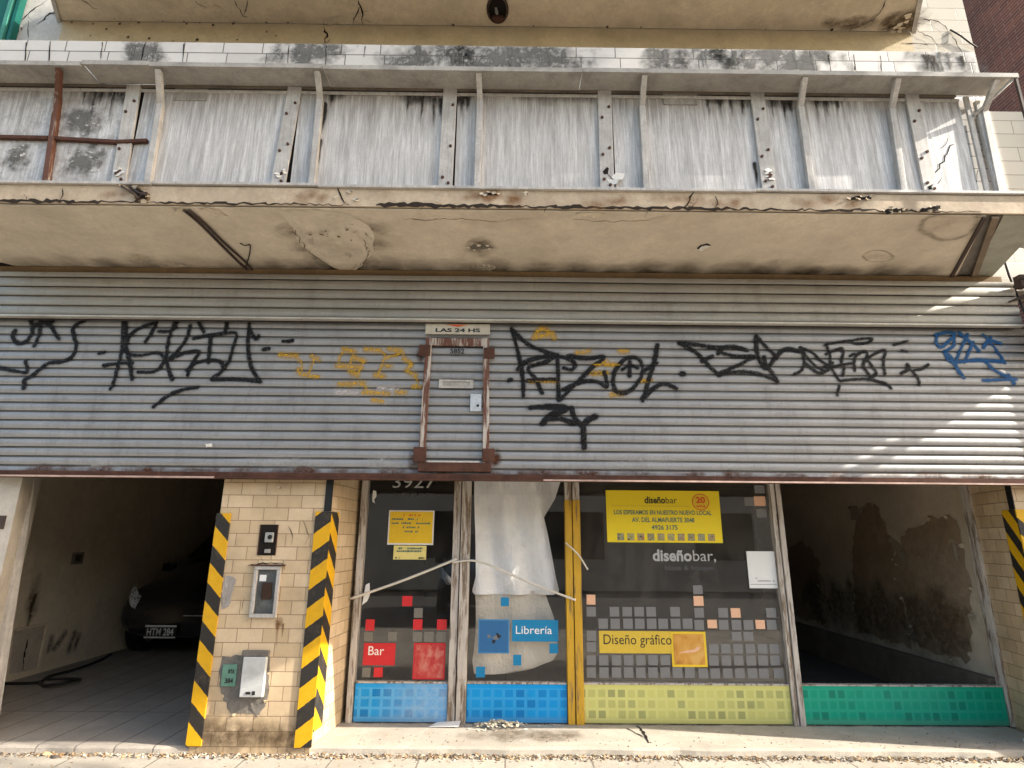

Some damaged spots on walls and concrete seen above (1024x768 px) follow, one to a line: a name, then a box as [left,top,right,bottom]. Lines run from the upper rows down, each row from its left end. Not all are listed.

water stain [882,12,924,31]
crack [844,1,962,52]
water stain [266,22,342,64]
water stain [382,45,591,68]
water stain [646,48,831,70]
water stain [920,52,971,72]
crack [935,138,982,184]
crack [0,188,349,208]
crack [376,192,983,223]